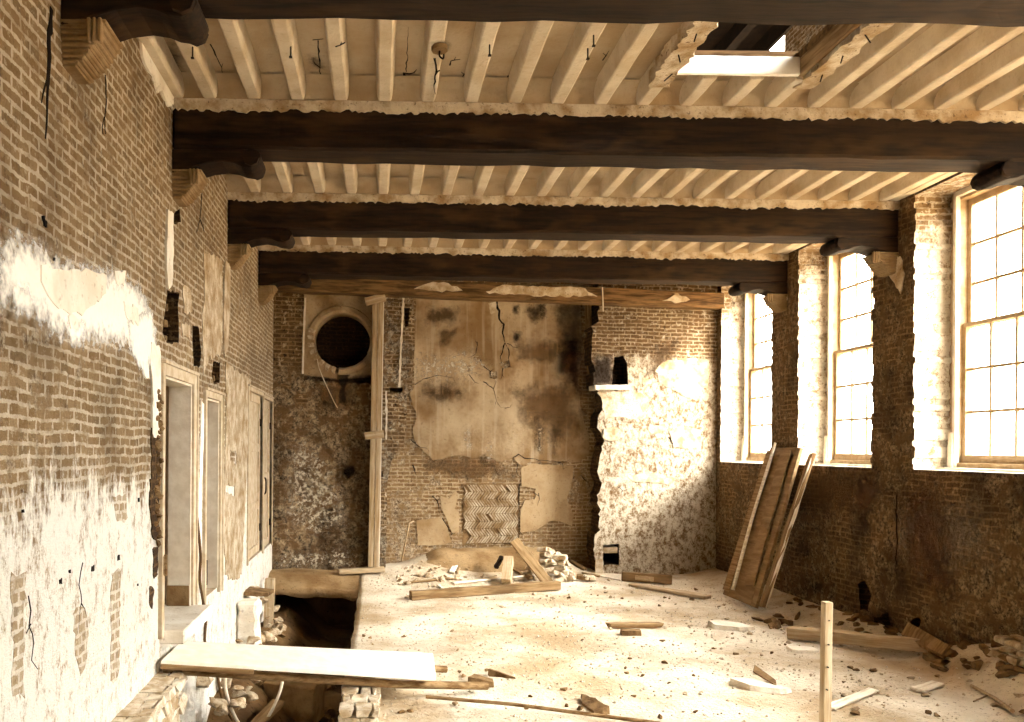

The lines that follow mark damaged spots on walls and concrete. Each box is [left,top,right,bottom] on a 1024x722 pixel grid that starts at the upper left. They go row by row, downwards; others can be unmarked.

spalling [649,21,719,88]
peeling [40,257,126,330]
crack [415,302,517,408]
water stain [518,341,565,362]
peeling [390,298,589,532]
water stain [516,384,583,450]
peeling [597,350,711,449]
peeling [416,490,460,546]
crack [893,495,901,576]
crack [26,596,38,669]
crack [77,562,86,633]
spalling [858,581,891,626]